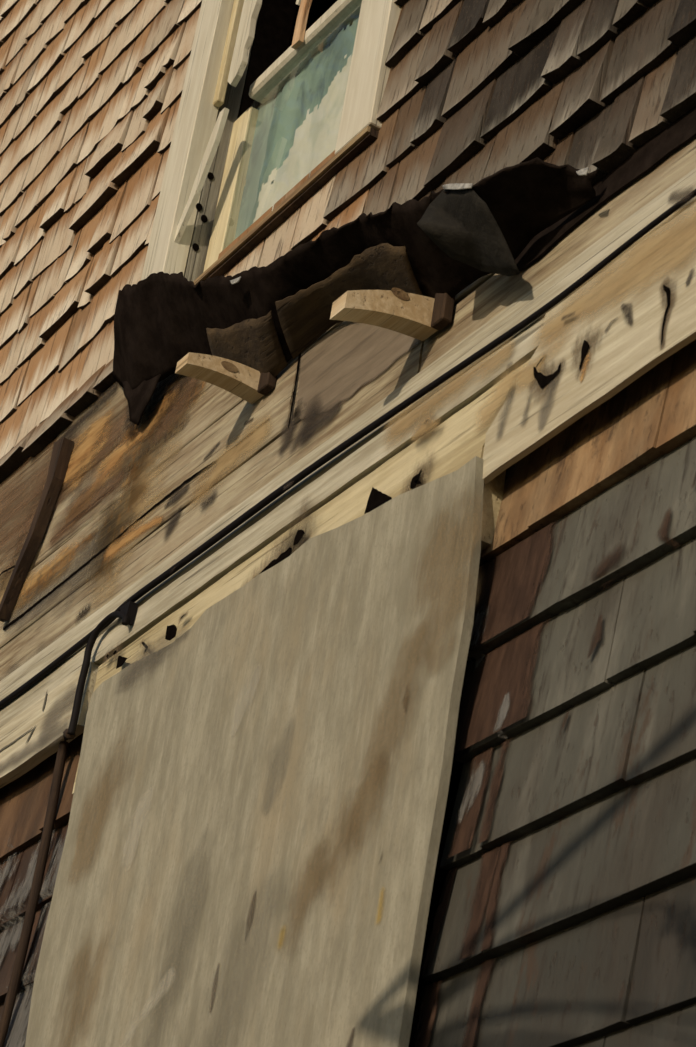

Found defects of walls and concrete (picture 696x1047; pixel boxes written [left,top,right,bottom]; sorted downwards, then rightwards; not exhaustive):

crack [530,337,596,395]
crack [660,279,675,349]
damp [0,373,198,623]
damp [195,418,268,509]
peeling [413,521,554,1047]
peeling [0,833,66,964]
peeling [4,943,42,1047]